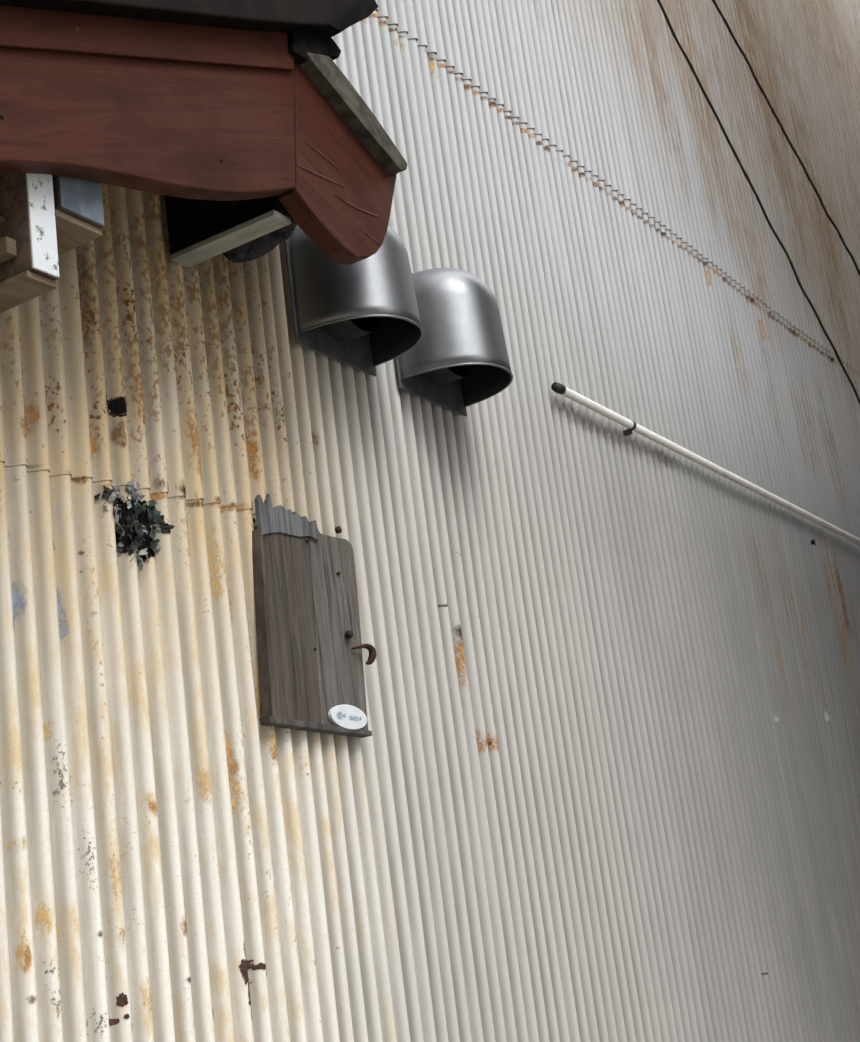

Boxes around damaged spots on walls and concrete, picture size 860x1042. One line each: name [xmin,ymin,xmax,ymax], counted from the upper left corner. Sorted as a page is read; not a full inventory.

rust [427,54,550,151]
rust [76,250,108,454]
rust [116,270,161,436]
rust [173,324,287,478]
rust [611,194,835,362]
peeling [94,479,175,569]
rust [149,472,204,507]
rust [454,626,466,676]